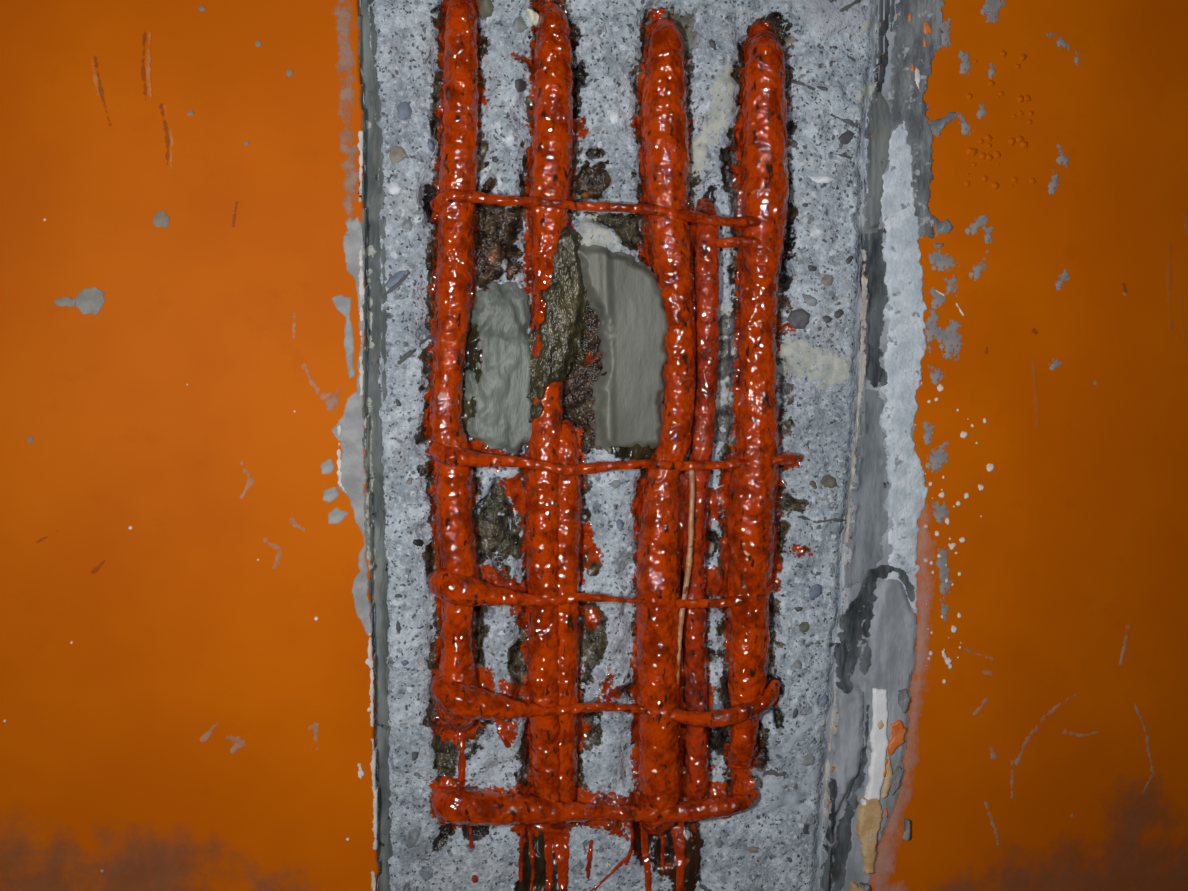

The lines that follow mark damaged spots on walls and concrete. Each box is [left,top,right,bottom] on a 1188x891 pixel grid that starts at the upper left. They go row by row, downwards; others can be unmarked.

spalling [568,19,589,112]
spalling [474,177,528,292]
spalling [571,148,647,251]
spalling [702,147,737,203]
spalling [779,167,797,292]
peeling [55,287,105,315]
peeling [320,0,379,850]
spalling [714,311,738,446]
peeling [814,0,993,891]
spalling [472,476,521,578]
spalling [579,602,609,679]
spalling [432,823,490,852]